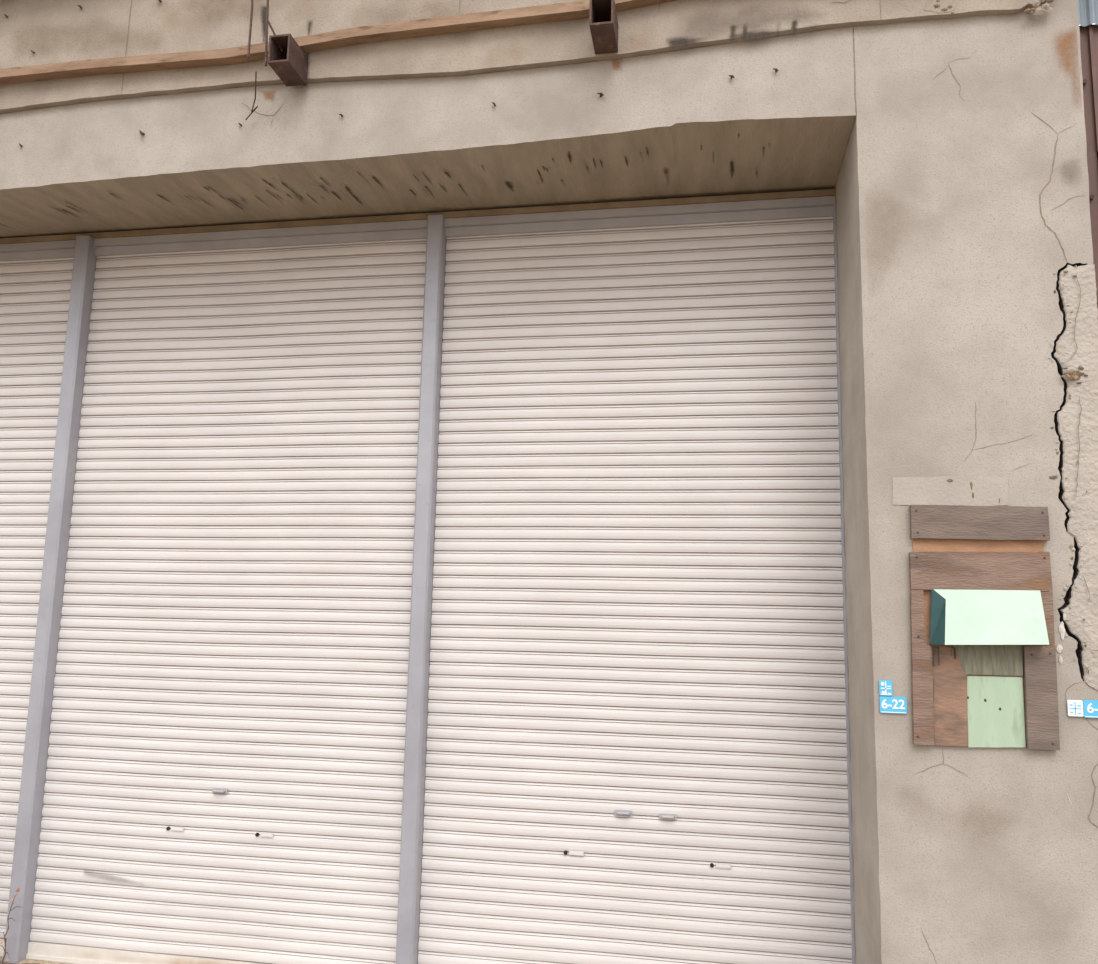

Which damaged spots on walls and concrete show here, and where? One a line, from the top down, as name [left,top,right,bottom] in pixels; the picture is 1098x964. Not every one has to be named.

spalling [1024,0,1055,15]
crack [965,112,1094,698]
crack [1088,764,1098,828]